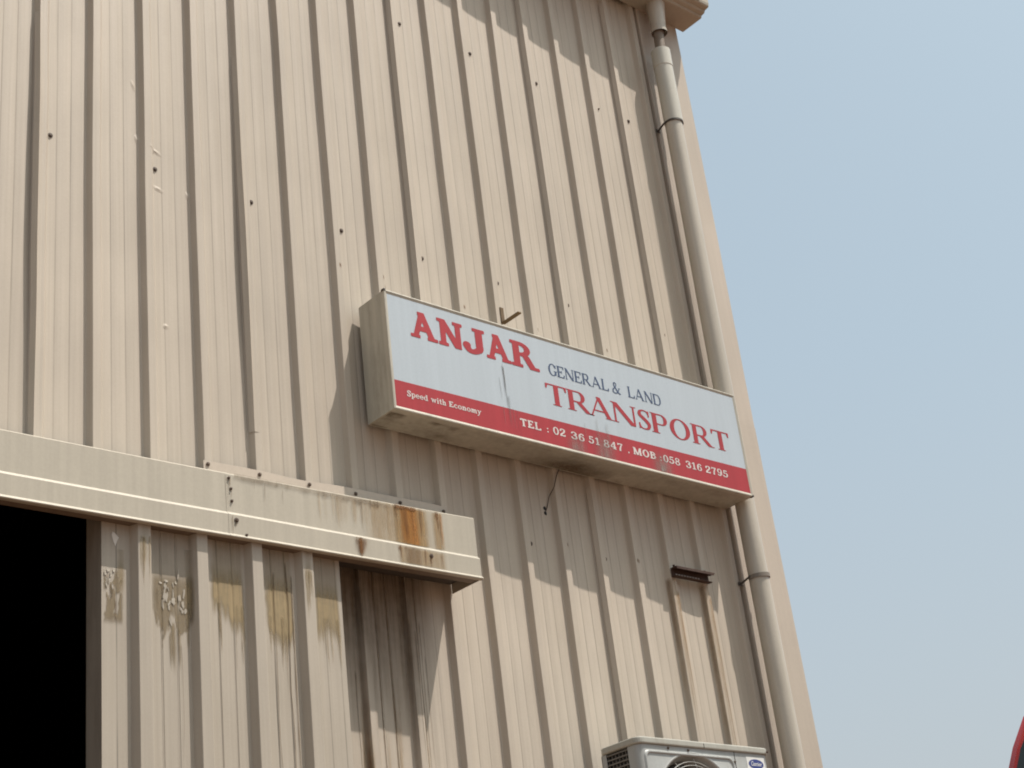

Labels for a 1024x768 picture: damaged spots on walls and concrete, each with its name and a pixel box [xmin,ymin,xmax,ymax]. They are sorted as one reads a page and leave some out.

corrosion [394,505,442,566]
peeling [104,568,123,620]
peeling [154,569,193,661]
water stain [213,573,243,627]
water stain [266,567,301,768]
water stain [306,567,429,768]